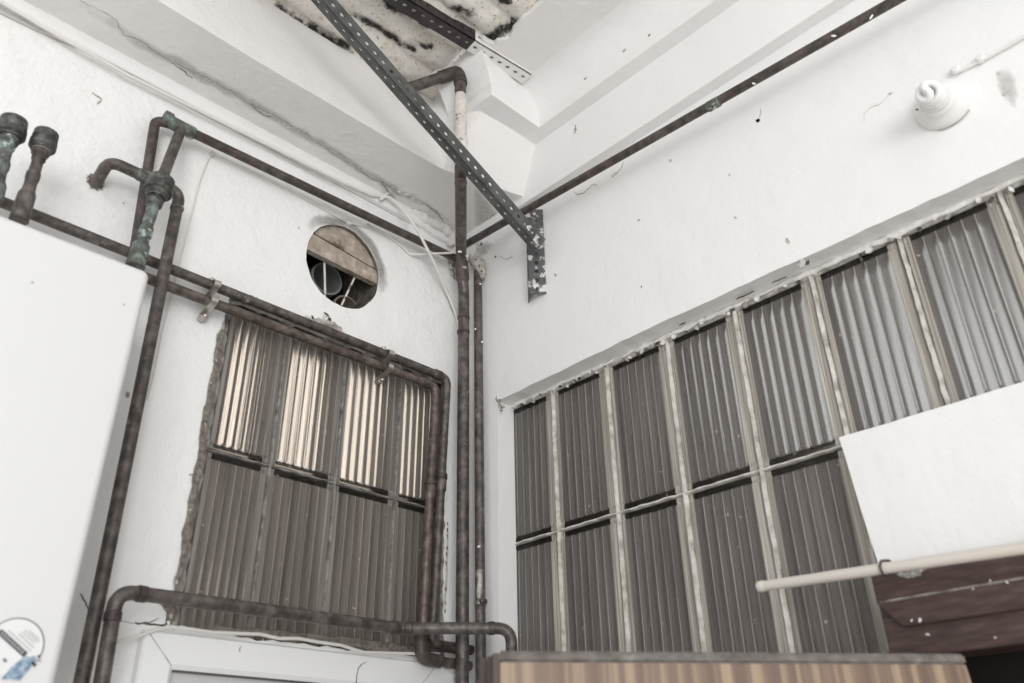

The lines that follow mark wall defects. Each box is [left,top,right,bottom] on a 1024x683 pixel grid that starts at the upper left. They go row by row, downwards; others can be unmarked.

leakage [276,4,354,52]
leakage [353,15,433,52]
leakage [384,1,429,29]
leakage [485,0,517,40]
crack [79,0,449,224]